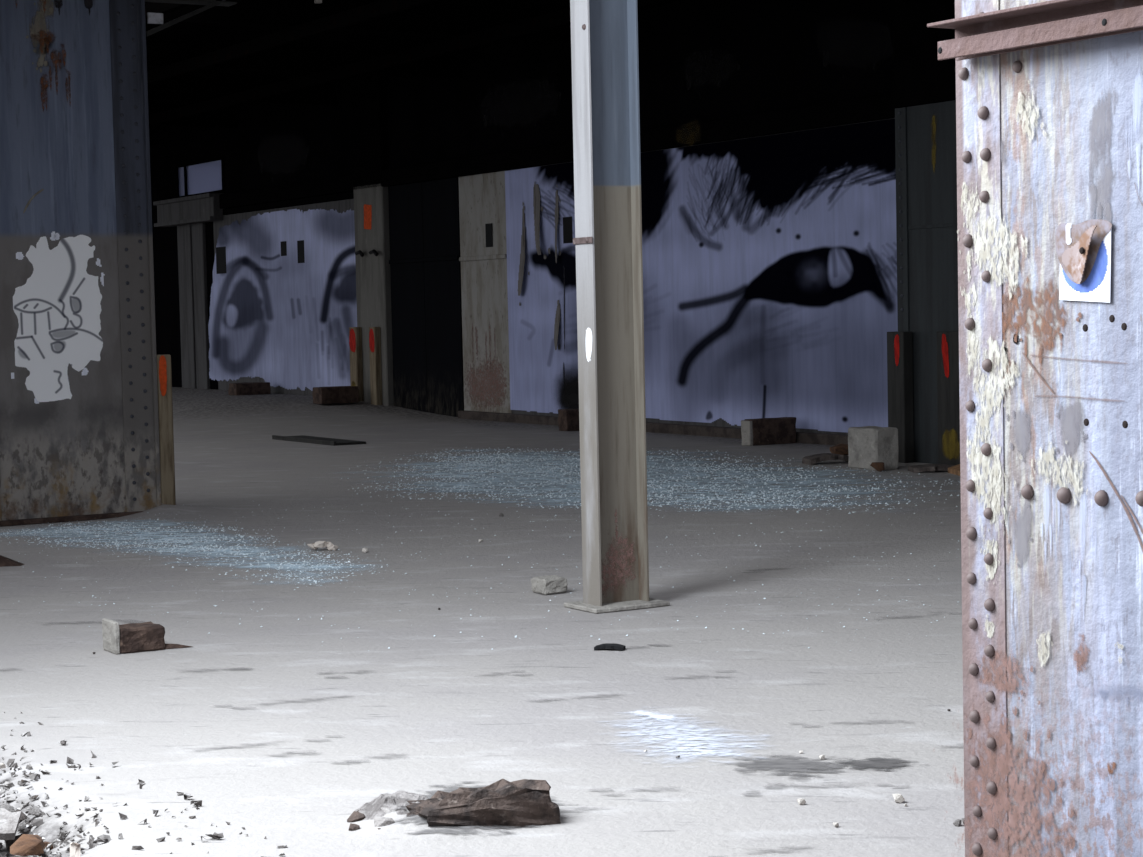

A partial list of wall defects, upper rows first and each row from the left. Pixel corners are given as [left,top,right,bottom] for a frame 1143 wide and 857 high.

corrosion [31,30,71,111]
peeling [957,183,1088,584]
corrosion [1002,277,1082,390]
corrosion [1074,635,1090,675]
corrosion [950,651,1077,857]